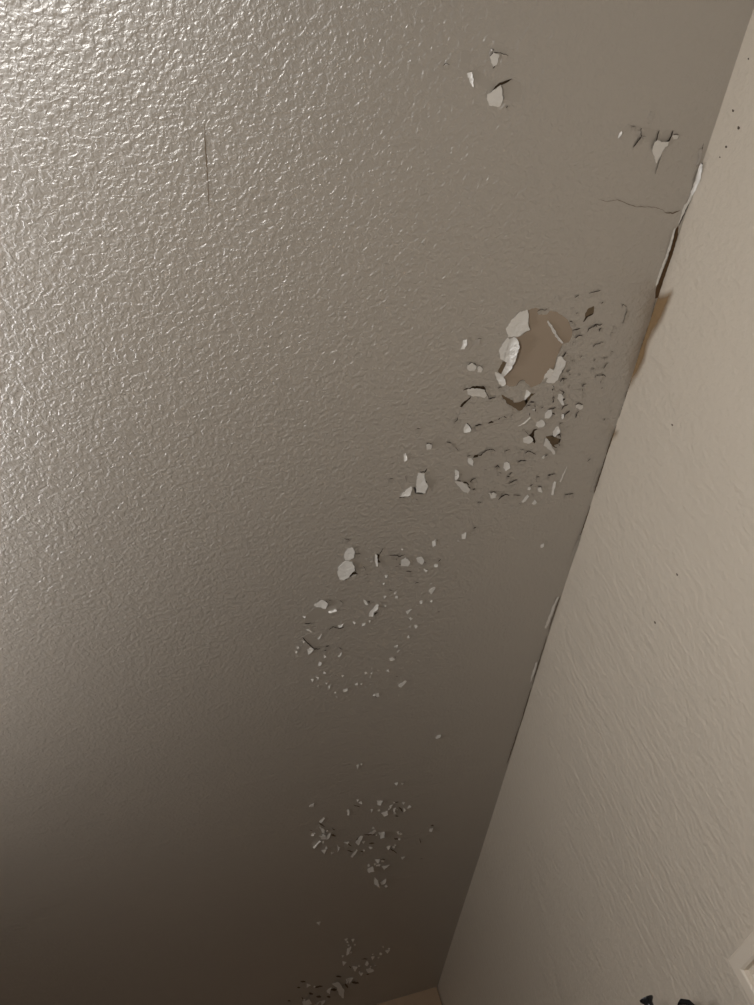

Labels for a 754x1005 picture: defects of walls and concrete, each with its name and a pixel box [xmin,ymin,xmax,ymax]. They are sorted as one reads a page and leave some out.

peeling [443,49,522,111]
peeling [618,112,679,175]
peeling [425,290,630,509]
peeling [389,465,435,505]
peeling [296,539,443,702]
peeling [308,800,412,888]
peeling [287,938,390,1005]